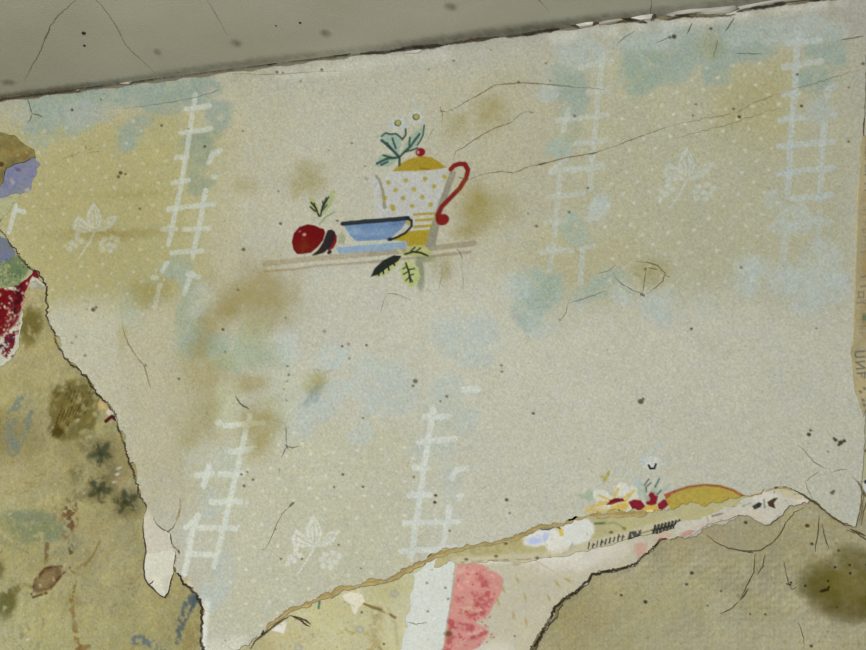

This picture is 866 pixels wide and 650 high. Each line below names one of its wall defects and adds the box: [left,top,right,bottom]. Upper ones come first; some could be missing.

peeling [0,281,205,650]
peeling [240,566,423,650]
peeling [536,492,866,650]
damp [804,564,866,608]